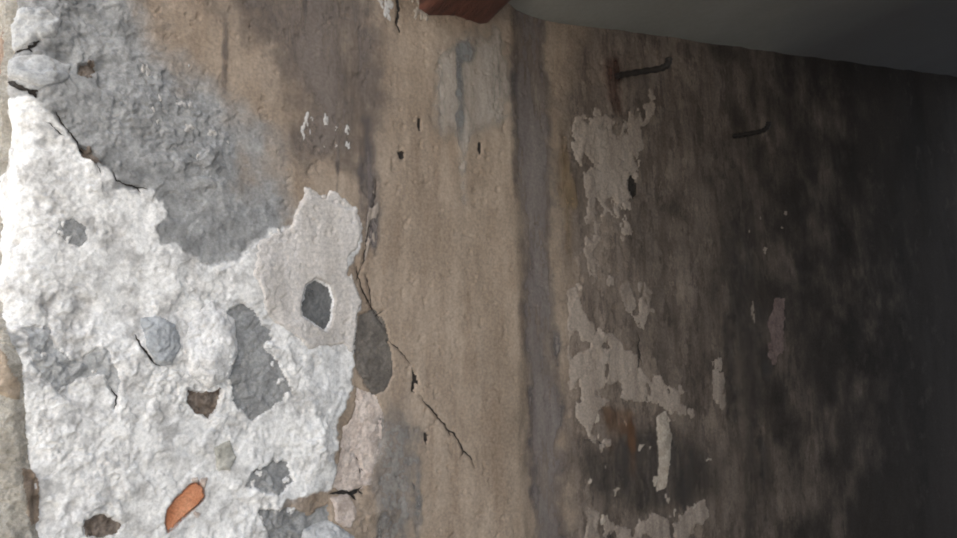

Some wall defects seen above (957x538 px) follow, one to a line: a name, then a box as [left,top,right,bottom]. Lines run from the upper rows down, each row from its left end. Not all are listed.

spalling [77,60,95,78]
spalling [78,146,102,164]
peeling [301,111,350,149]
spalling [57,219,88,247]
crack [356,181,409,362]
peeling [567,88,709,538]
spalling [25,327,121,394]
peeling [187,187,392,538]
crack [419,395,475,469]
peeling [21,468,40,525]
spalling [83,514,121,538]
flaking render [164,477,208,533]